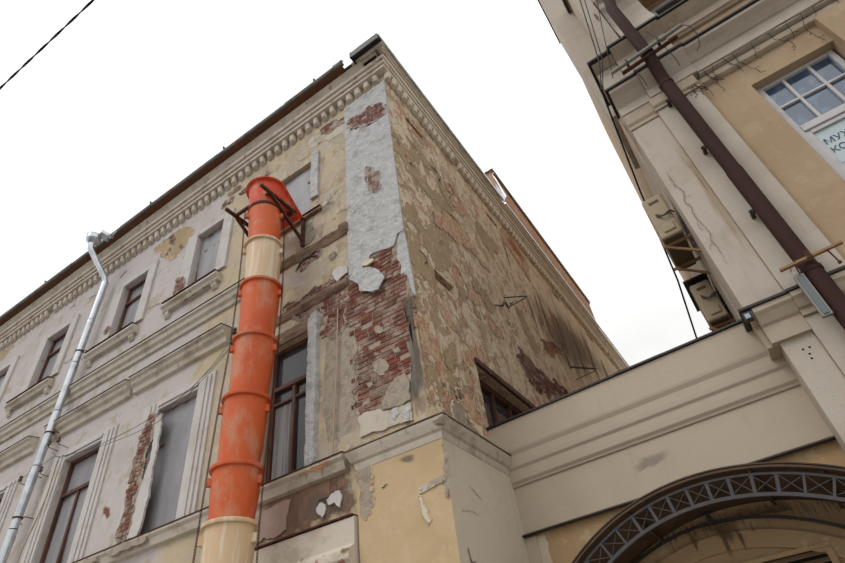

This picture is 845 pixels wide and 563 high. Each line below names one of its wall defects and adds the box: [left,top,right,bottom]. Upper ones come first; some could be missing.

flaking render [305,101,387,149]
flaking render [364,165,381,193]
peeling [153,225,195,262]
peeling [390,128,504,340]
peeling [474,220,531,281]
flaking render [281,222,431,438]
flaking render [515,305,568,400]
peeling [450,343,488,434]
flaking render [107,412,163,557]
peeling [255,499,292,544]
peeling [316,490,343,518]